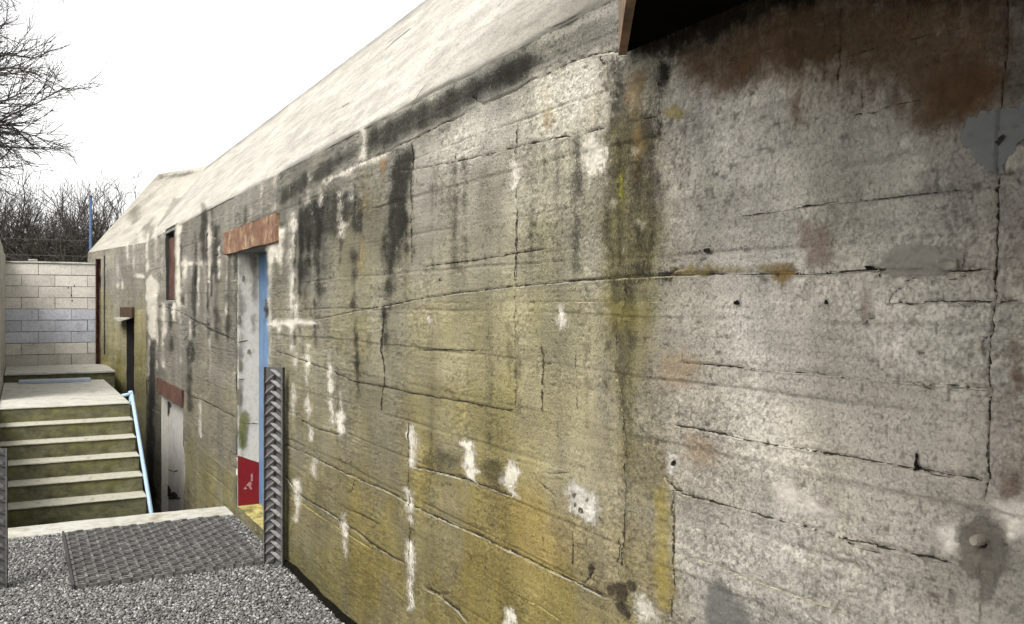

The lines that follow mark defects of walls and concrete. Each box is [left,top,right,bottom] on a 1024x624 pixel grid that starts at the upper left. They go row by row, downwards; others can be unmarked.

corrosion [635,0,815,57]
crack [1001,1,1009,109]
damp [580,57,677,285]
damp [260,53,542,379]
crack [276,51,1020,623]
efflorescence [327,363,346,434]
efflorescence [406,425,418,466]
efflorescence [459,441,481,484]
efflorescence [501,461,520,497]
efflorescence [405,541,416,610]
damp [937,501,1024,598]
efflorescence [503,608,516,624]